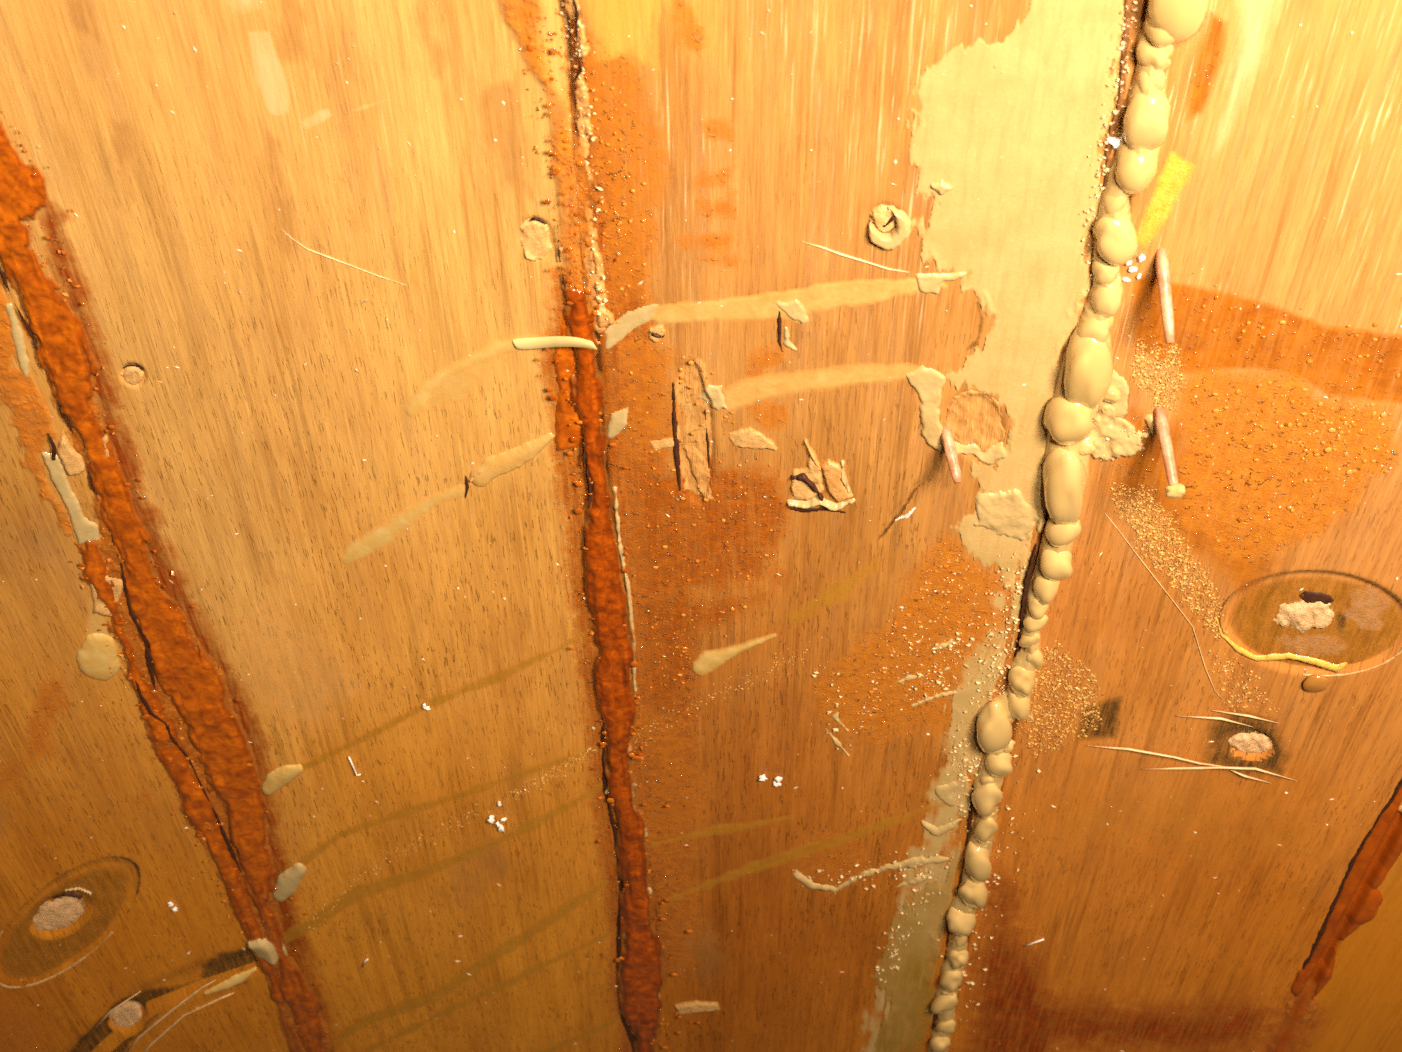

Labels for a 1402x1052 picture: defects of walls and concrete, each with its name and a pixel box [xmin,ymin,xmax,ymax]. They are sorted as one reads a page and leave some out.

crack [569,0,583,78]
crack [0,267,97,496]
crack [582,445,592,509]
rust [568,28,787,971]
peeling [786,440,856,511]
peeling [906,365,1007,465]
peeling [974,450,1048,542]
peeling [1090,369,1157,461]
crack [108,529,242,873]
rust [42,201,334,1052]
rust [541,268,655,1052]
rust [815,542,999,745]